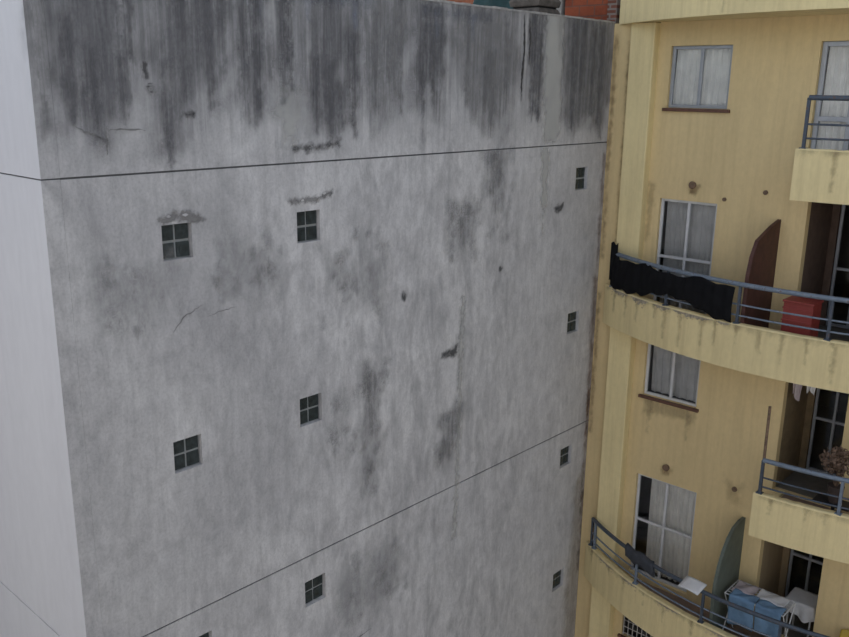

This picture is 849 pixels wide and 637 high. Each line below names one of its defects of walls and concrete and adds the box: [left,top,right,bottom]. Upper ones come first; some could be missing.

leakage [59,0,132,129]
leakage [143,0,224,148]
leakage [237,0,271,112]
leakage [293,142,339,152]
leakage [310,0,360,131]
leakage [530,13,608,212]